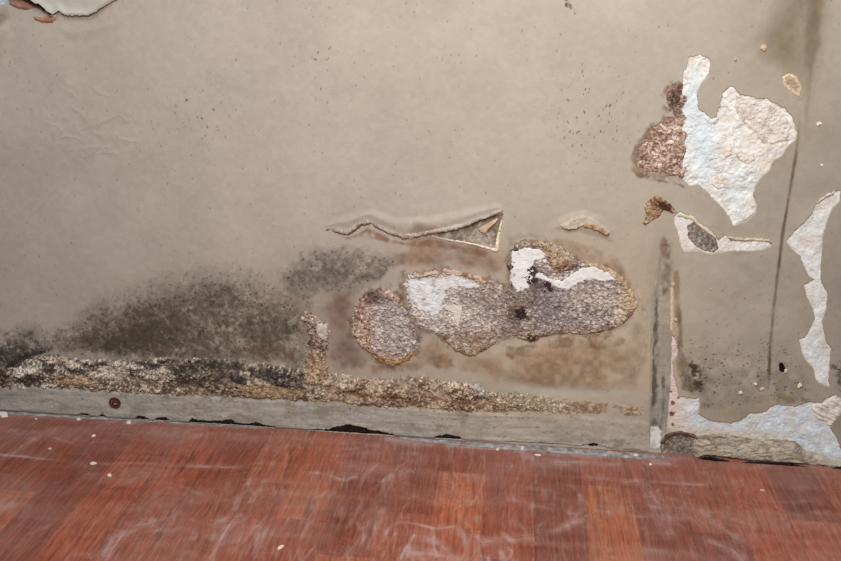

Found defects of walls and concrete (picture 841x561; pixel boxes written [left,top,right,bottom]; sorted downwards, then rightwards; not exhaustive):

peeling [0,0,115,23]
flaking render [635,54,797,225]
flaking render [782,73,802,97]
water stain [0,282,643,417]
water stain [287,233,443,291]
peeling [325,209,503,254]
spalling [347,239,639,368]
flaking render [674,212,774,254]
flaking render [660,336,841,467]
flaking render [787,190,841,386]